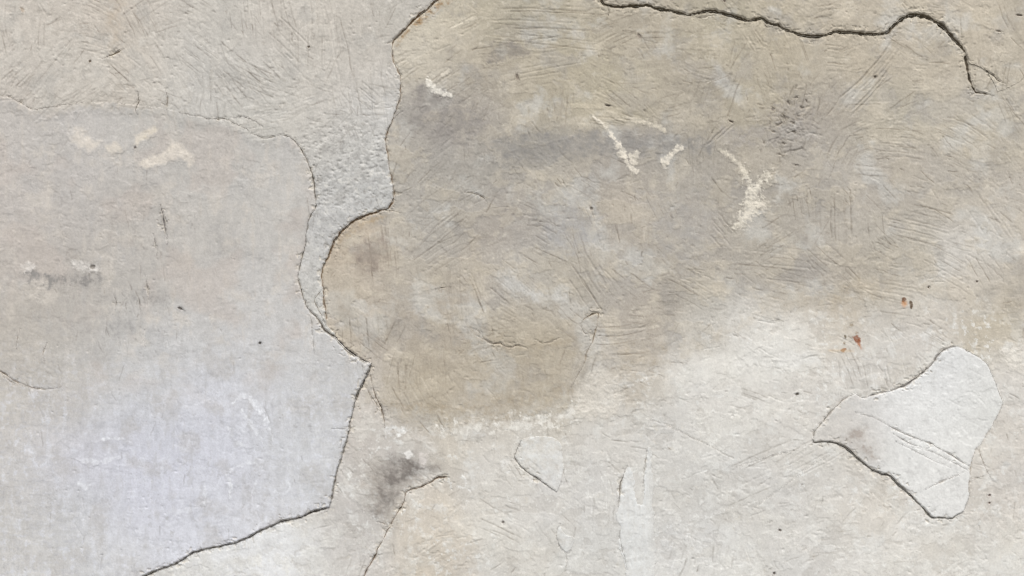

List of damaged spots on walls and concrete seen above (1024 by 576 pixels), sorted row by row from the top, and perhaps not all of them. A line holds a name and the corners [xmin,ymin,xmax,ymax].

crack [599,0,1005,97]
crack [0,94,76,111]
flaking render [0,0,436,576]
crack [135,0,449,576]
leakage [342,226,401,279]
leakage [360,263,907,482]
flaking render [516,436,564,491]